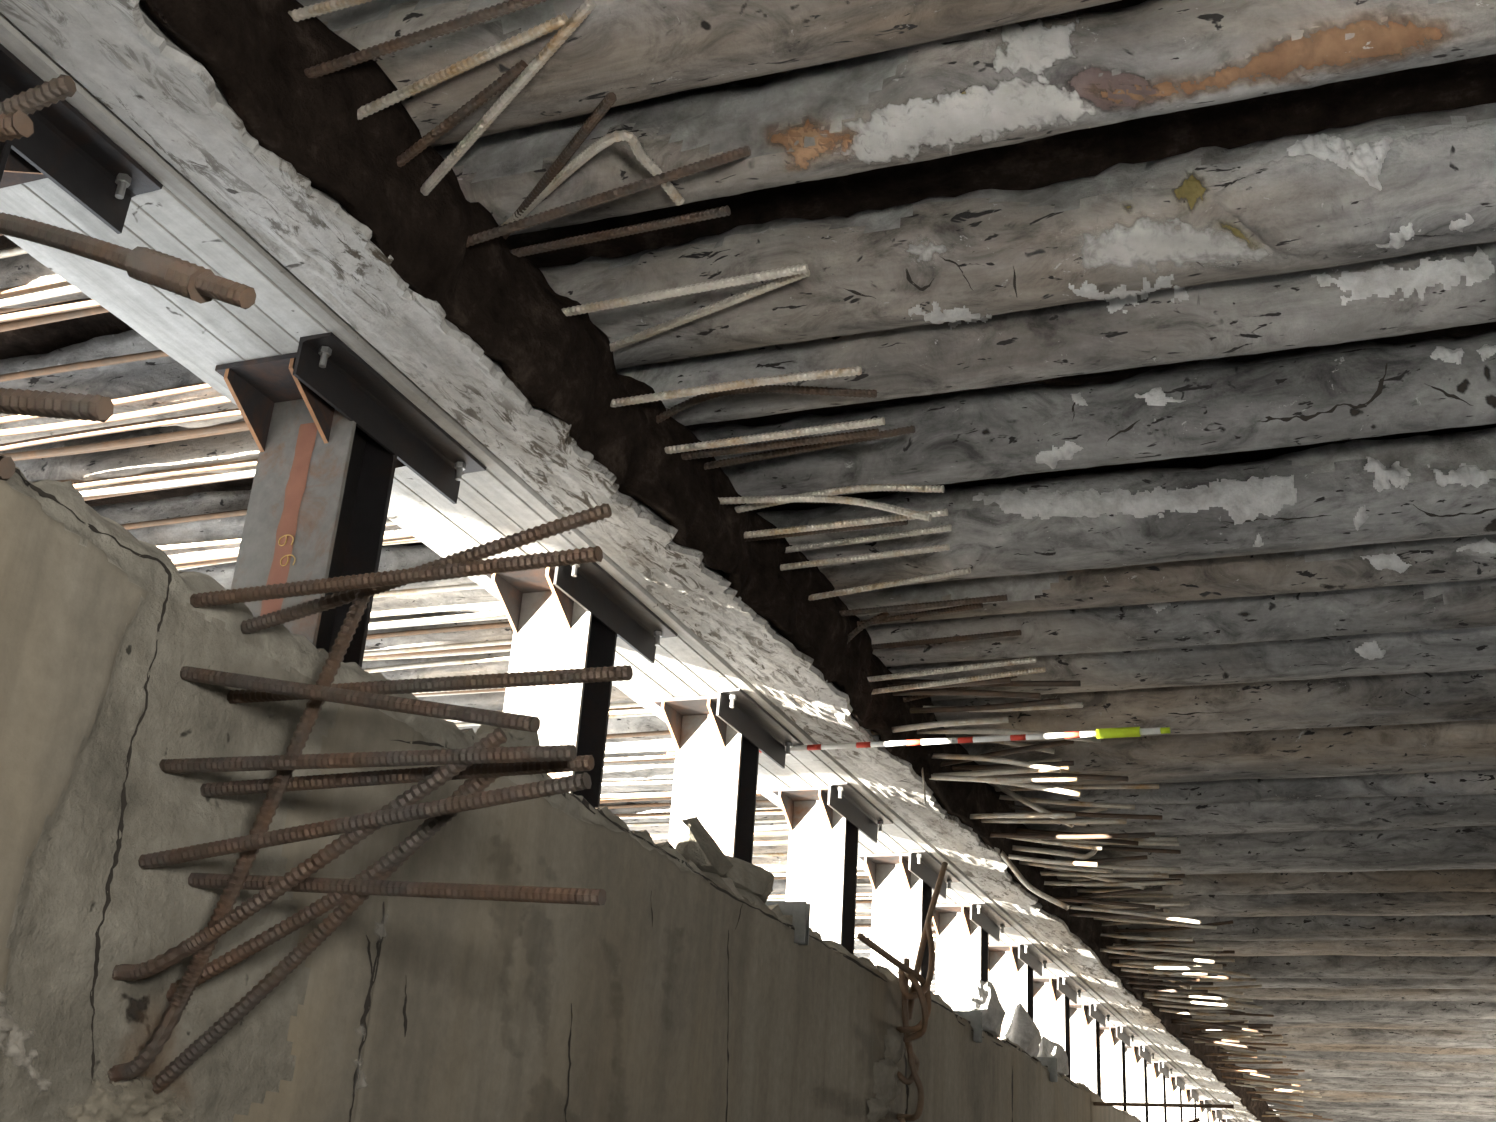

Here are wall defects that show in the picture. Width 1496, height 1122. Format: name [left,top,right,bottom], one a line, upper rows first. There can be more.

rust [1090,14,1451,105]
rust [767,116,857,170]
crack [15,468,172,1079]
spalling [67,1074,186,1122]